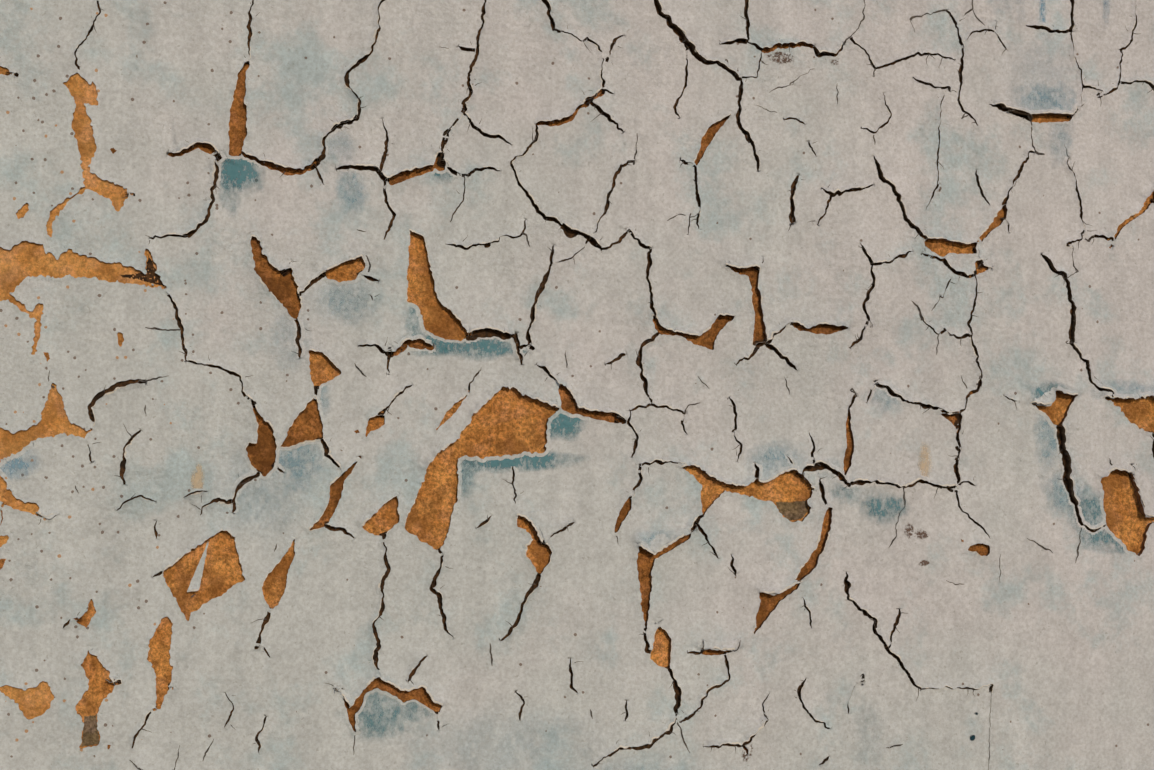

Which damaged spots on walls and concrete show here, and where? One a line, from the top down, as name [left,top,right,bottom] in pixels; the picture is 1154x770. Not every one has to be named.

peeling [0,594,126,753]
peeling [0,69,172,570]
crack [145,0,401,302]
peeling [142,226,627,714]
peeling [326,670,448,755]
crack [437,0,747,462]
peeling [610,388,859,673]
crack [591,572,997,770]
crack [796,242,1001,580]
crack [649,0,1154,231]
crack [1027,115,1118,399]
peeling [1002,386,1154,560]